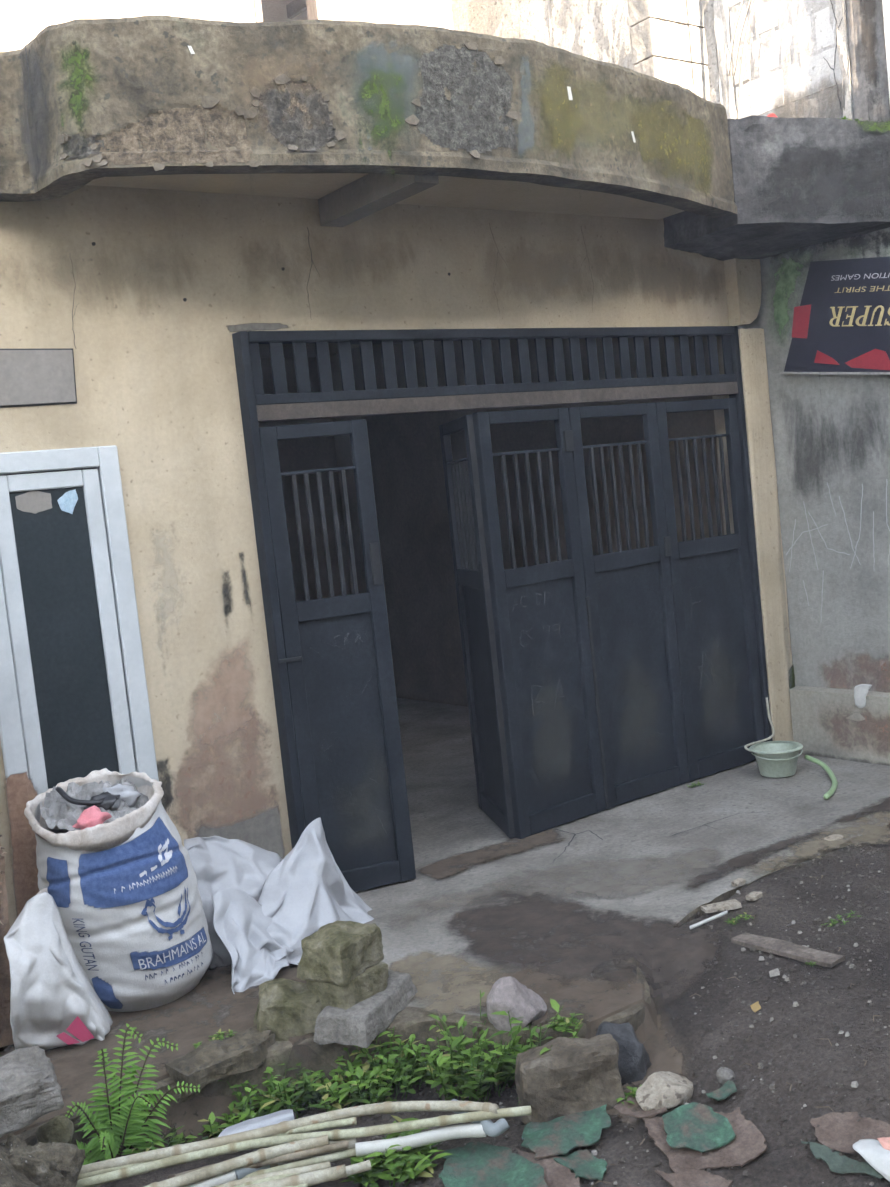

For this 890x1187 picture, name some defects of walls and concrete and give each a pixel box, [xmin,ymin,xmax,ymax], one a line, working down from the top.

spalling [58,73,348,171]
spalling [404,41,518,159]
leakage [774,81,848,120]
leakage [859,0,882,121]
leakage [758,136,890,220]
leakage [795,405,873,491]
peeling [174,643,284,859]